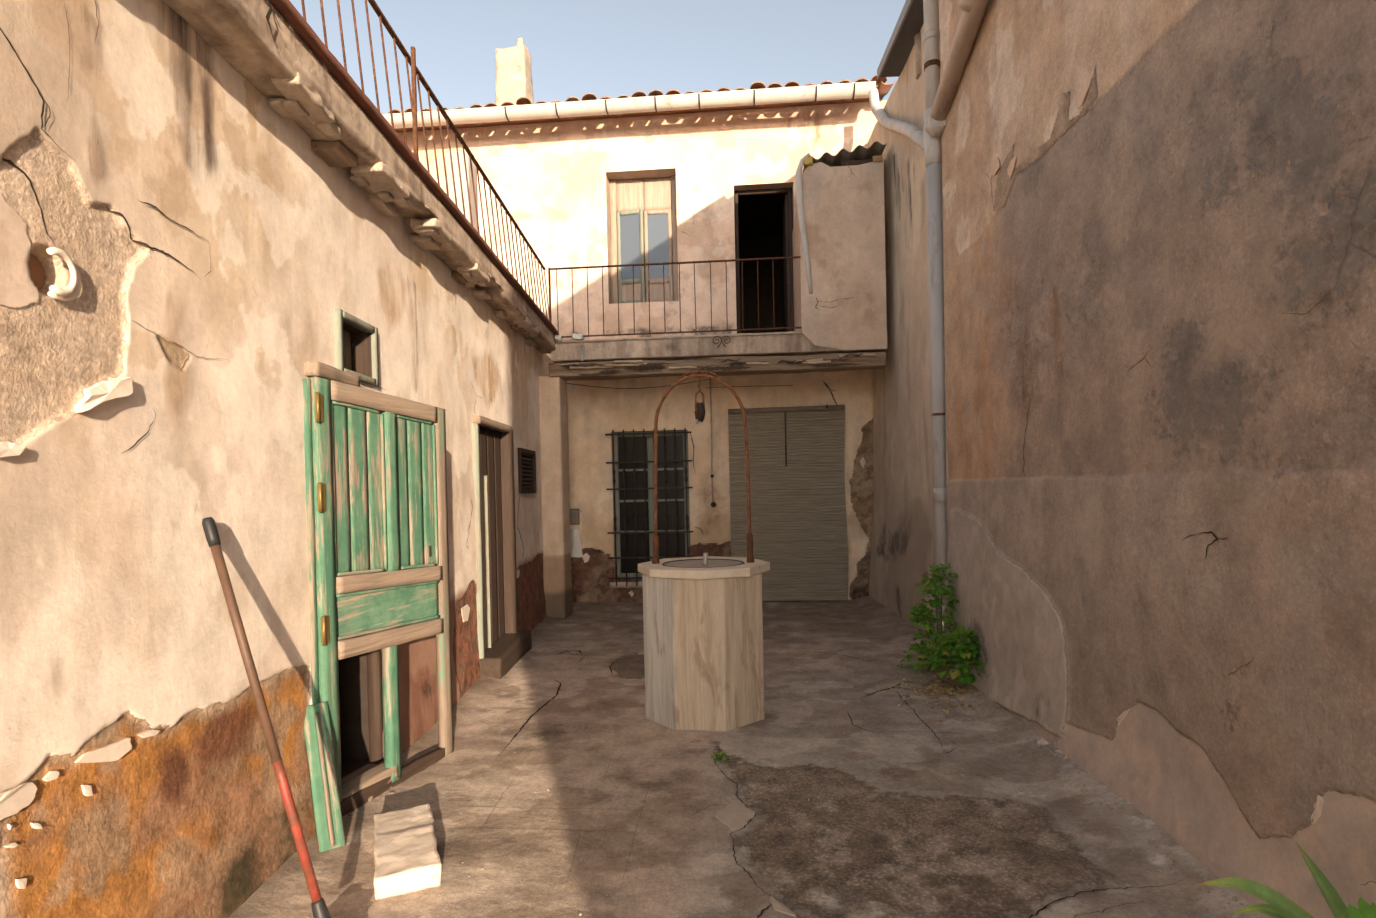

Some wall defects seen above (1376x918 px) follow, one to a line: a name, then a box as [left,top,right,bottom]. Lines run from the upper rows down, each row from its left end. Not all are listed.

crack [0,0,99,158]
flaking render [991,65,1097,211]
flaking render [0,131,150,458]
crack [107,199,211,274]
crack [121,409,156,454]
flaking render [849,418,874,600]
flaking render [0,665,316,918]
water stain [223,851,258,914]
crack [444,650,676,909]
crack [700,762,801,918]
crack [1029,881,1178,918]
flaking render [1057,703,1376,918]